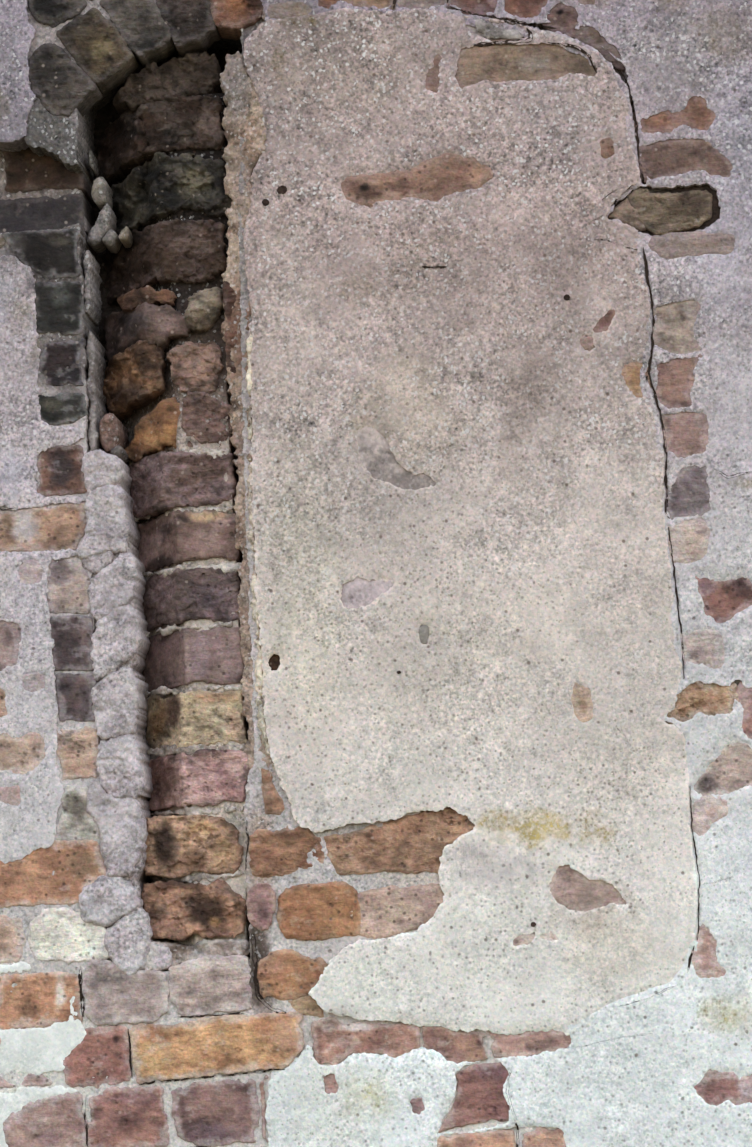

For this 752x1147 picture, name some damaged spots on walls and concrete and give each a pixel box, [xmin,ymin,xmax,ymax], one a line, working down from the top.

peeling [262,0,626,93]
peeling [608,96,735,259]
crack [447,0,684,679]
peeling [356,426,436,490]
peeling [621,300,711,564]
peeling [0,620,46,692]
peeling [680,576,752,669]
peeling [0,732,45,806]
peeling [665,680,752,836]
peeling [549,864,627,912]
peeling [246,768,571,1147]
peeling [691,924,726,978]